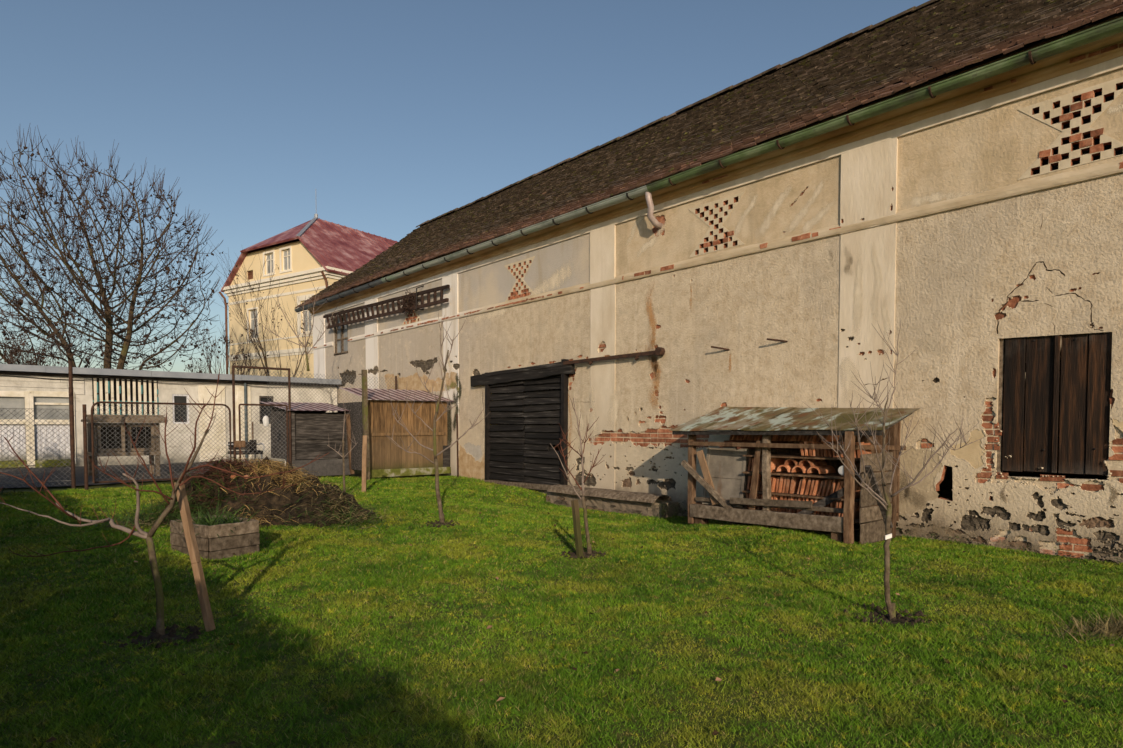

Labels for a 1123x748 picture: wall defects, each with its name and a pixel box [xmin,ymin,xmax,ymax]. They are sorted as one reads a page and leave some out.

corrosion [620,279,661,410]
crack [995,261,1104,334]
flaking render [573,372,709,491]
flaking render [896,389,1123,563]